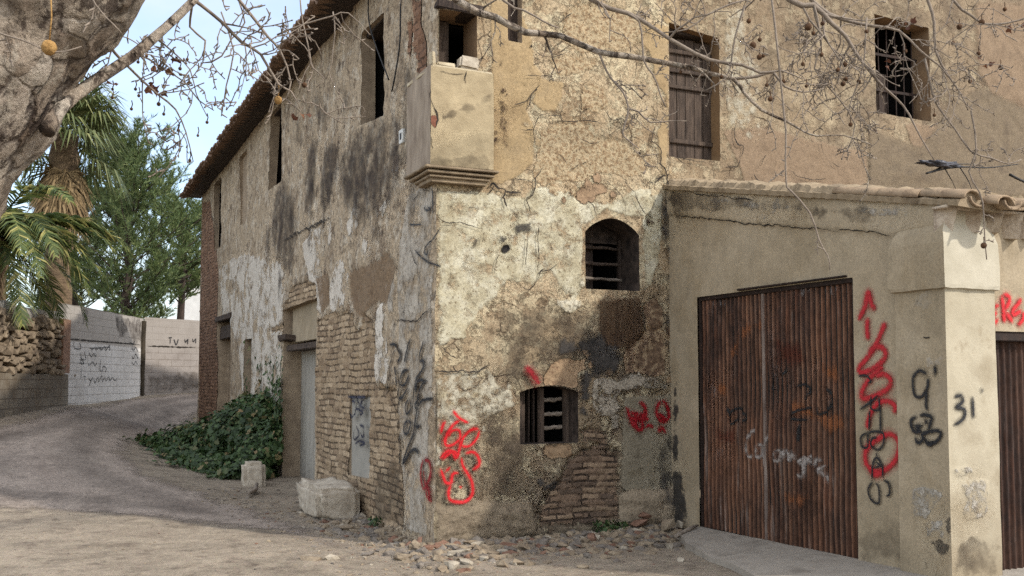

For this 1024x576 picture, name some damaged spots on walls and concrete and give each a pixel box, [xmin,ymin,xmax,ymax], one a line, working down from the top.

leakage [267,189,296,286]
leakage [307,122,407,232]
flaking render [198,0,672,535]
crack [442,48,625,290]
crack [591,95,888,236]
leakage [514,298,646,415]